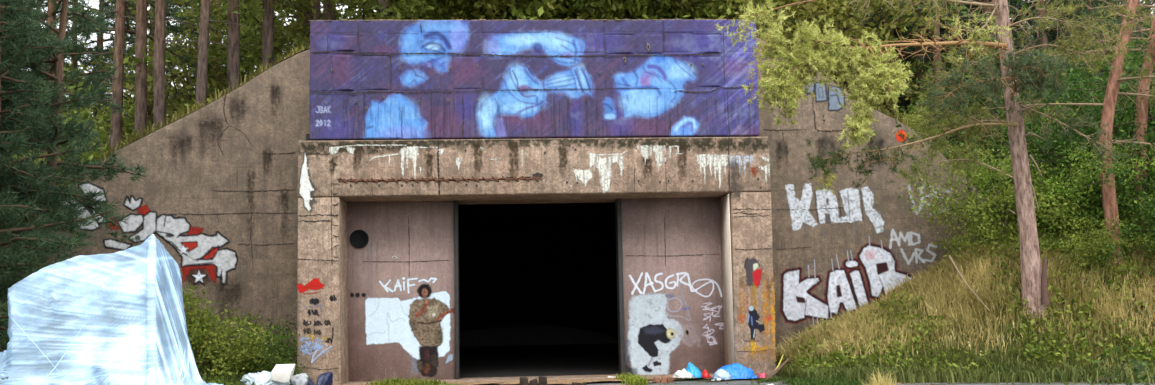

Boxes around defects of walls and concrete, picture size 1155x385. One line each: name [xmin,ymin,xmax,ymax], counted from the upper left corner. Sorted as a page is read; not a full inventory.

leakage [558,142,770,198]